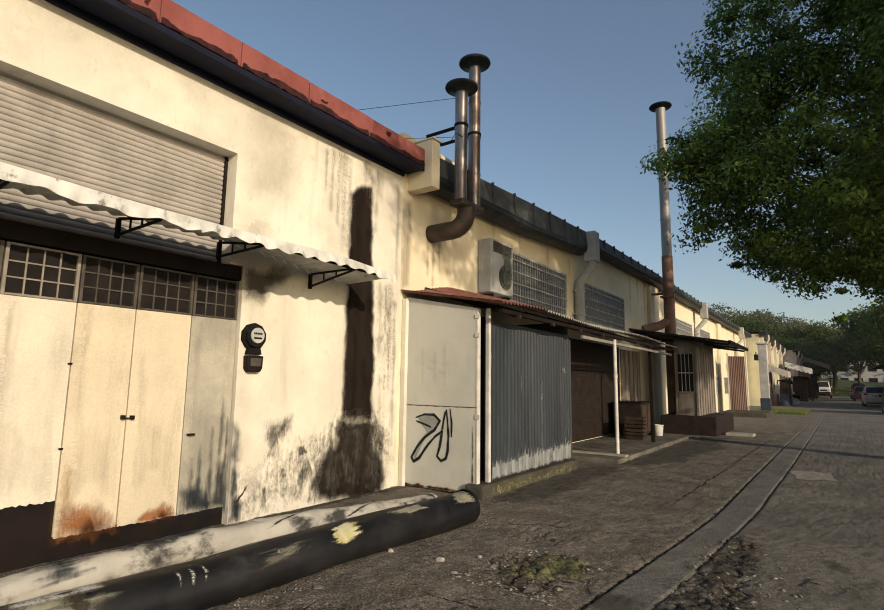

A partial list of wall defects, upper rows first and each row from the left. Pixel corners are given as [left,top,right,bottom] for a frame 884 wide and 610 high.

water stain [267,421,287,449]
water stain [190,439,241,521]
water stain [299,447,317,500]
corrosion [58,509,104,537]
corrosion [138,507,173,521]
crack [576,442,798,610]
crack [399,553,588,610]